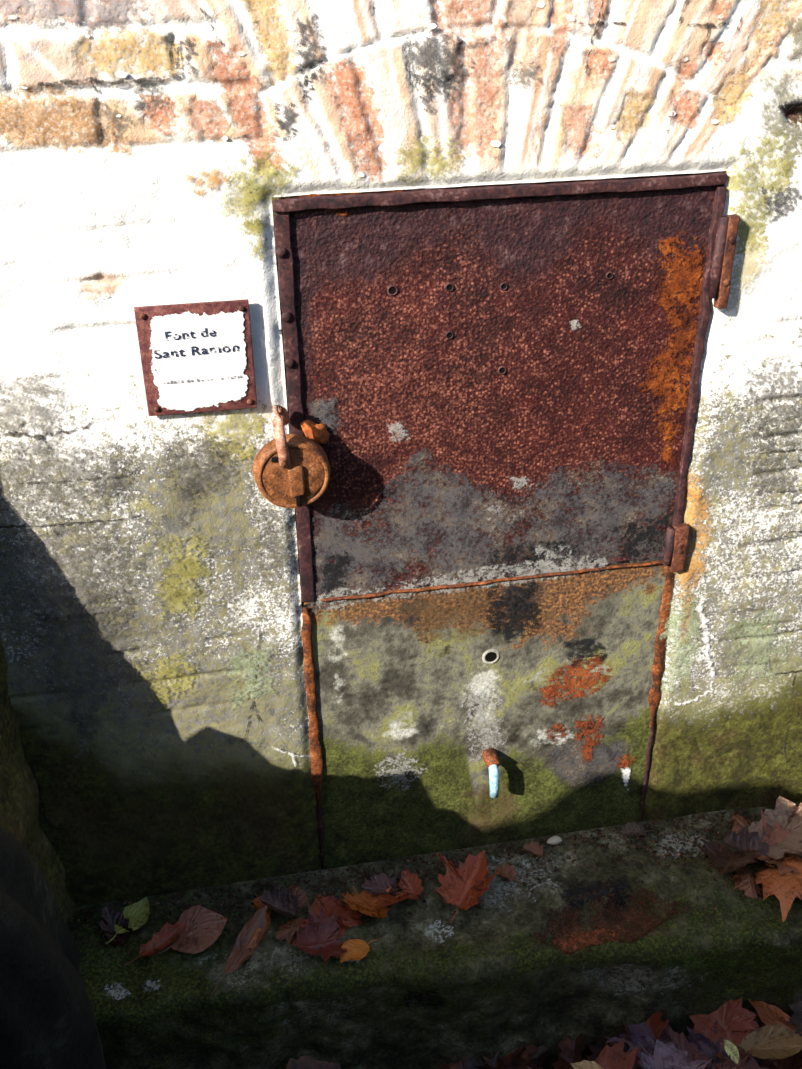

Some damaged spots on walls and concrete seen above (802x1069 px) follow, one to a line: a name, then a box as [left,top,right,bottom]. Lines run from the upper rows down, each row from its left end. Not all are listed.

mould [402,31,475,113]
rust [283,190,402,198]
rust [639,232,708,463]
water stain [744,358,802,496]
water stain [161,438,239,530]
water stain [0,373,149,759]
water stain [253,503,297,584]
rust [674,469,712,643]
rust [537,655,613,708]
efflorescence [675,593,718,705]
rust [545,714,604,763]